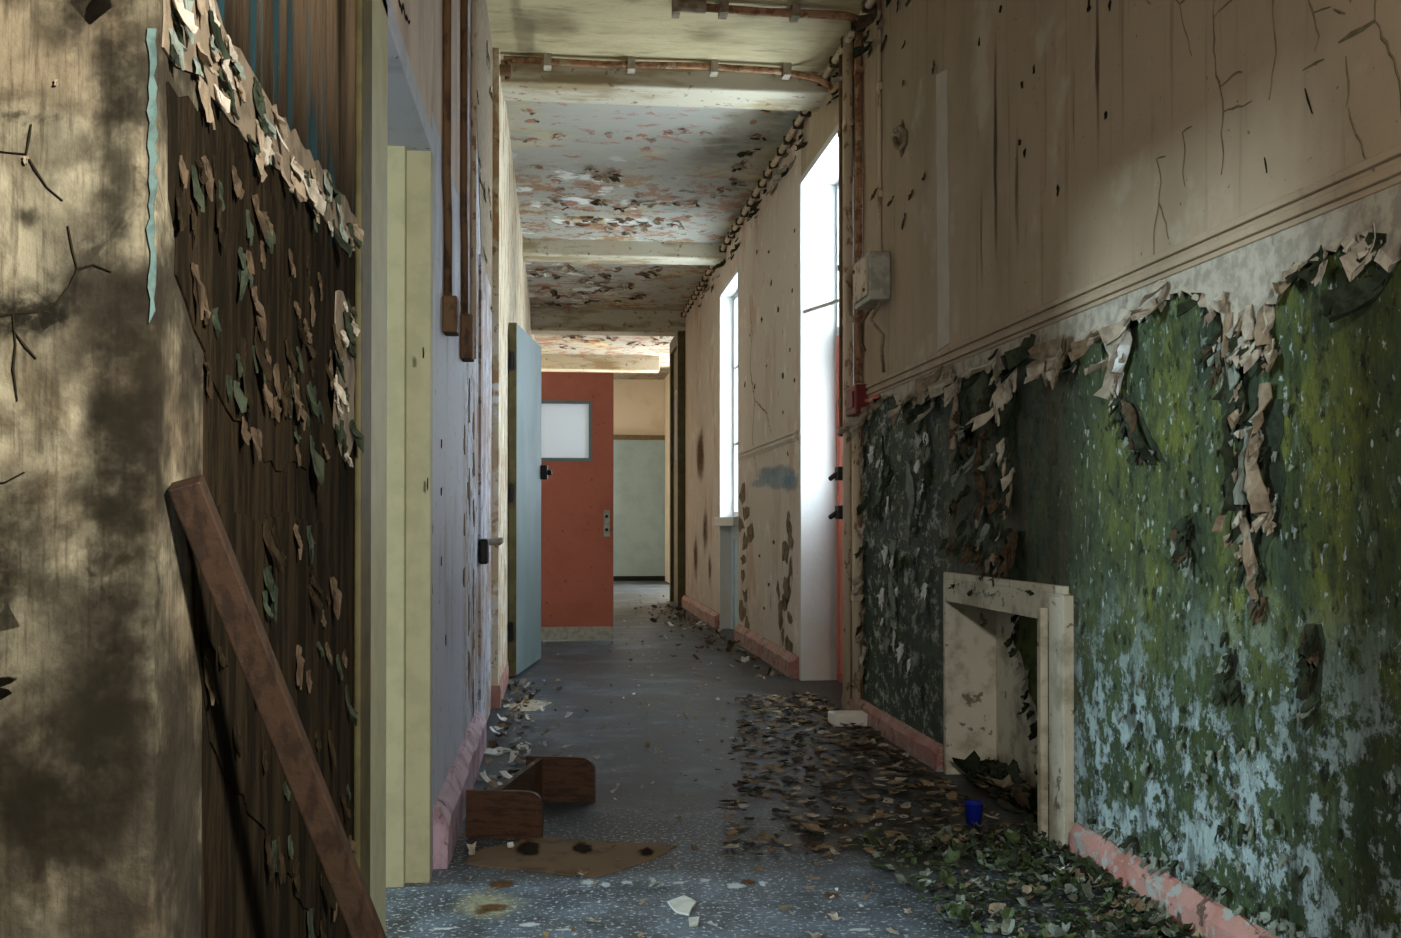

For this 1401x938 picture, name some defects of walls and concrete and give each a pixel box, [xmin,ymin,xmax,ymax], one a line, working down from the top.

crack [0,124,112,401]
water stain [103,144,130,210]
crack [1146,0,1401,251]
crack [0,472,25,484]
water stain [0,496,47,597]
water stain [94,501,146,624]
water stain [93,286,160,491]
peeling [146,0,364,852]
peeling [738,482,794,652]
peeling [835,183,1401,707]
peeling [186,536,338,938]
peeling [1003,614,1049,781]